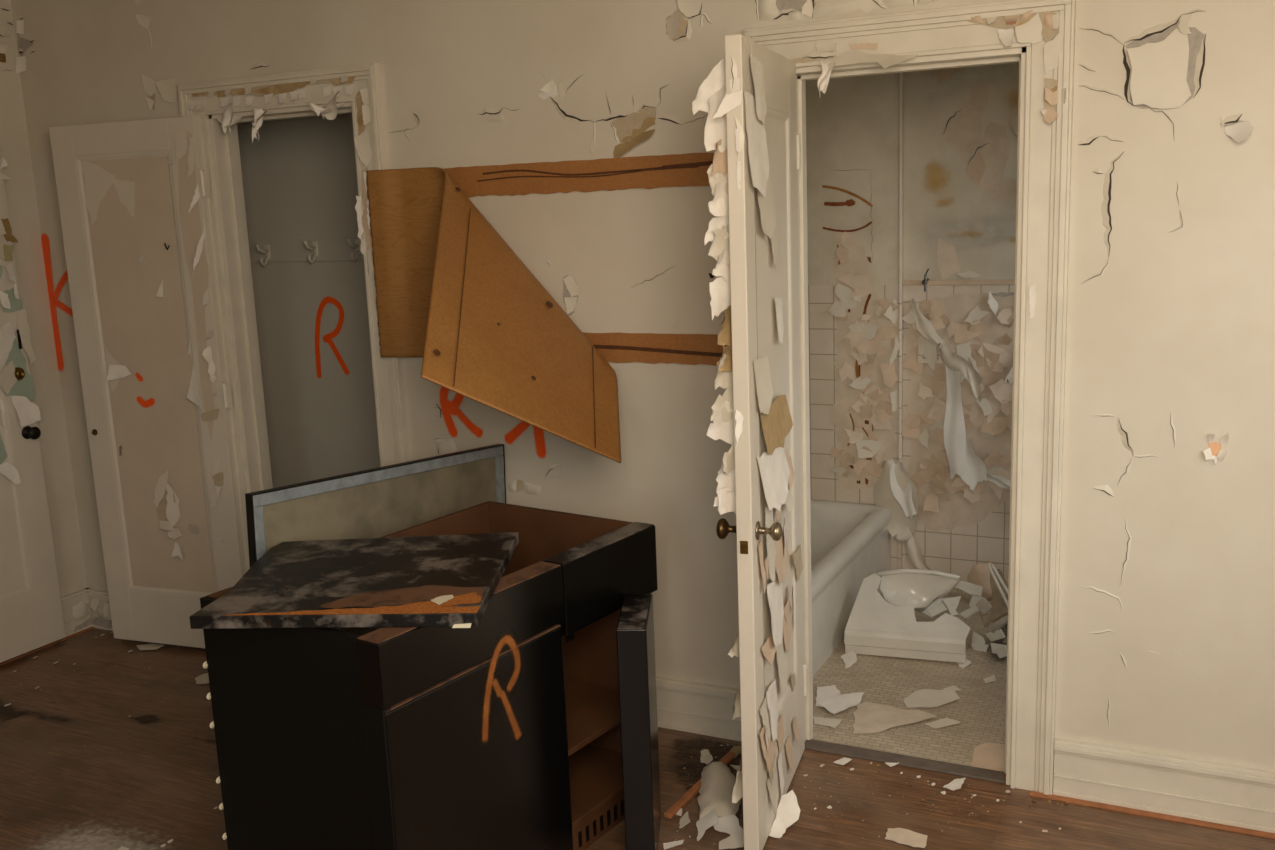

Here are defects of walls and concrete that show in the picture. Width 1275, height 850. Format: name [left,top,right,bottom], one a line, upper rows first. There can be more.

peeling [0,218,41,485]
peeling [188,75,374,273]
crack [478,71,708,158]
peeling [692,53,779,515]
peeling [793,42,919,94]
peeling [828,231,1014,576]
peeling [923,67,966,83]
peeling [942,78,1018,200]
crack [1077,135,1124,284]
crack [1168,182,1183,233]
peeling [753,356,803,838]
crack [1079,413,1202,678]